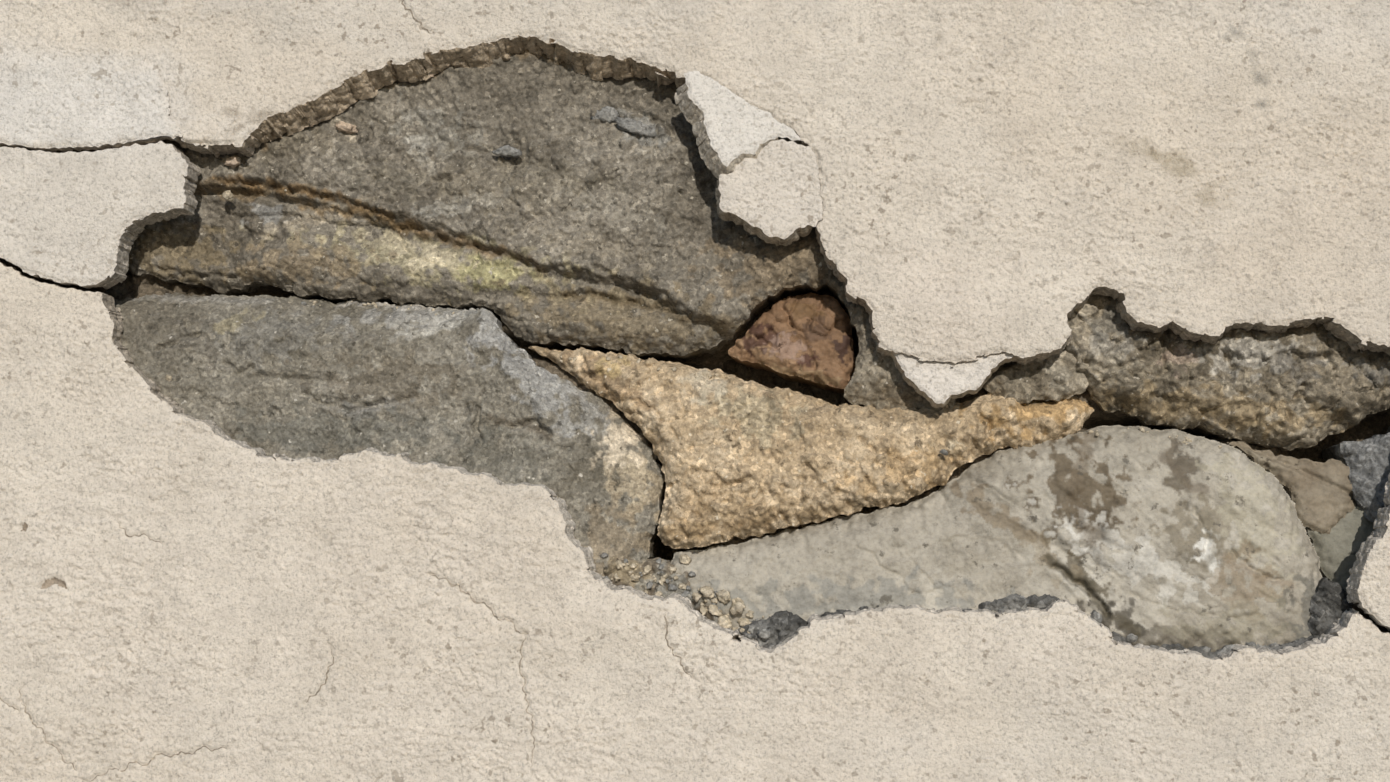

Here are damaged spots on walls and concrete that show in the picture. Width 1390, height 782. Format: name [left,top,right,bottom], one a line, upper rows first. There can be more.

crack [2,145,123,153]
crack [157,139,180,147]
crack [0,258,107,293]
spalling [0,35,1390,660]
crack [1351,602,1390,633]